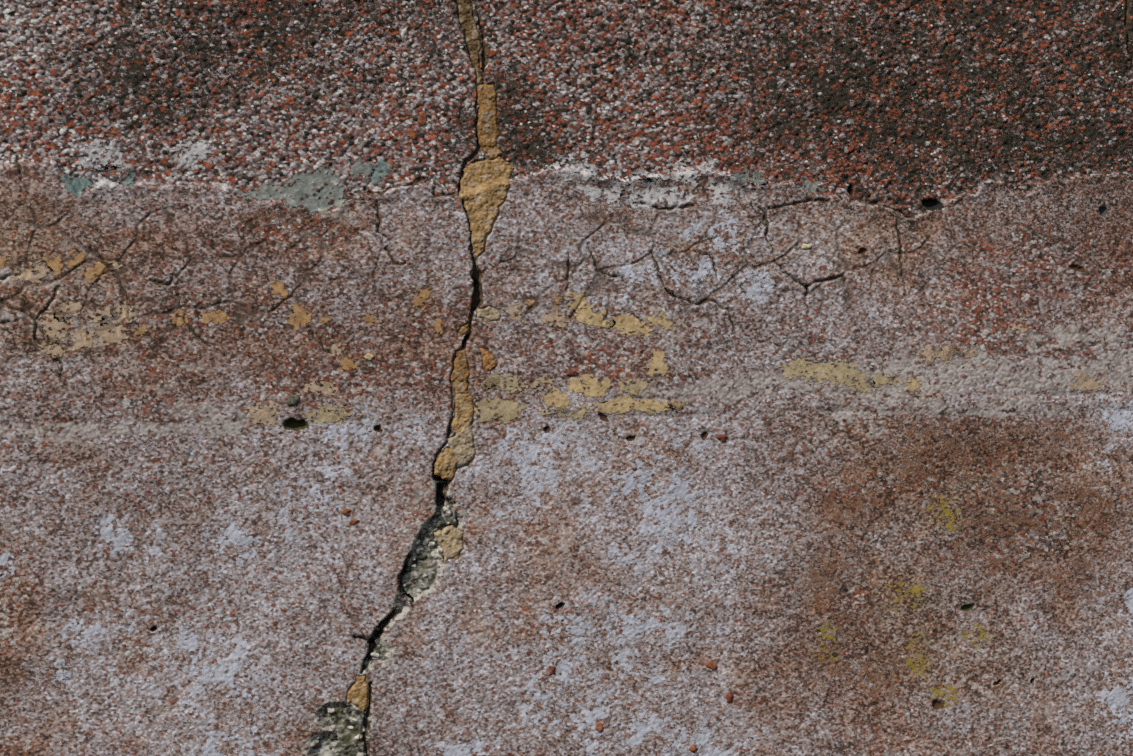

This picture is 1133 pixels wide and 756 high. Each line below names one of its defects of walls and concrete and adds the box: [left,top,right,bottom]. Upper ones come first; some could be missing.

crack [0,274,64,379]
crack [342,0,489,528]
peeling [413,288,431,310]
peeling [474,290,686,425]
crack [566,242,650,329]
crack [632,203,694,211]
crack [650,251,749,334]
crack [758,199,845,316]
water stain [490,0,1133,303]
flaking render [357,478,465,674]
crack [353,553,412,756]
flaking render [300,697,377,756]